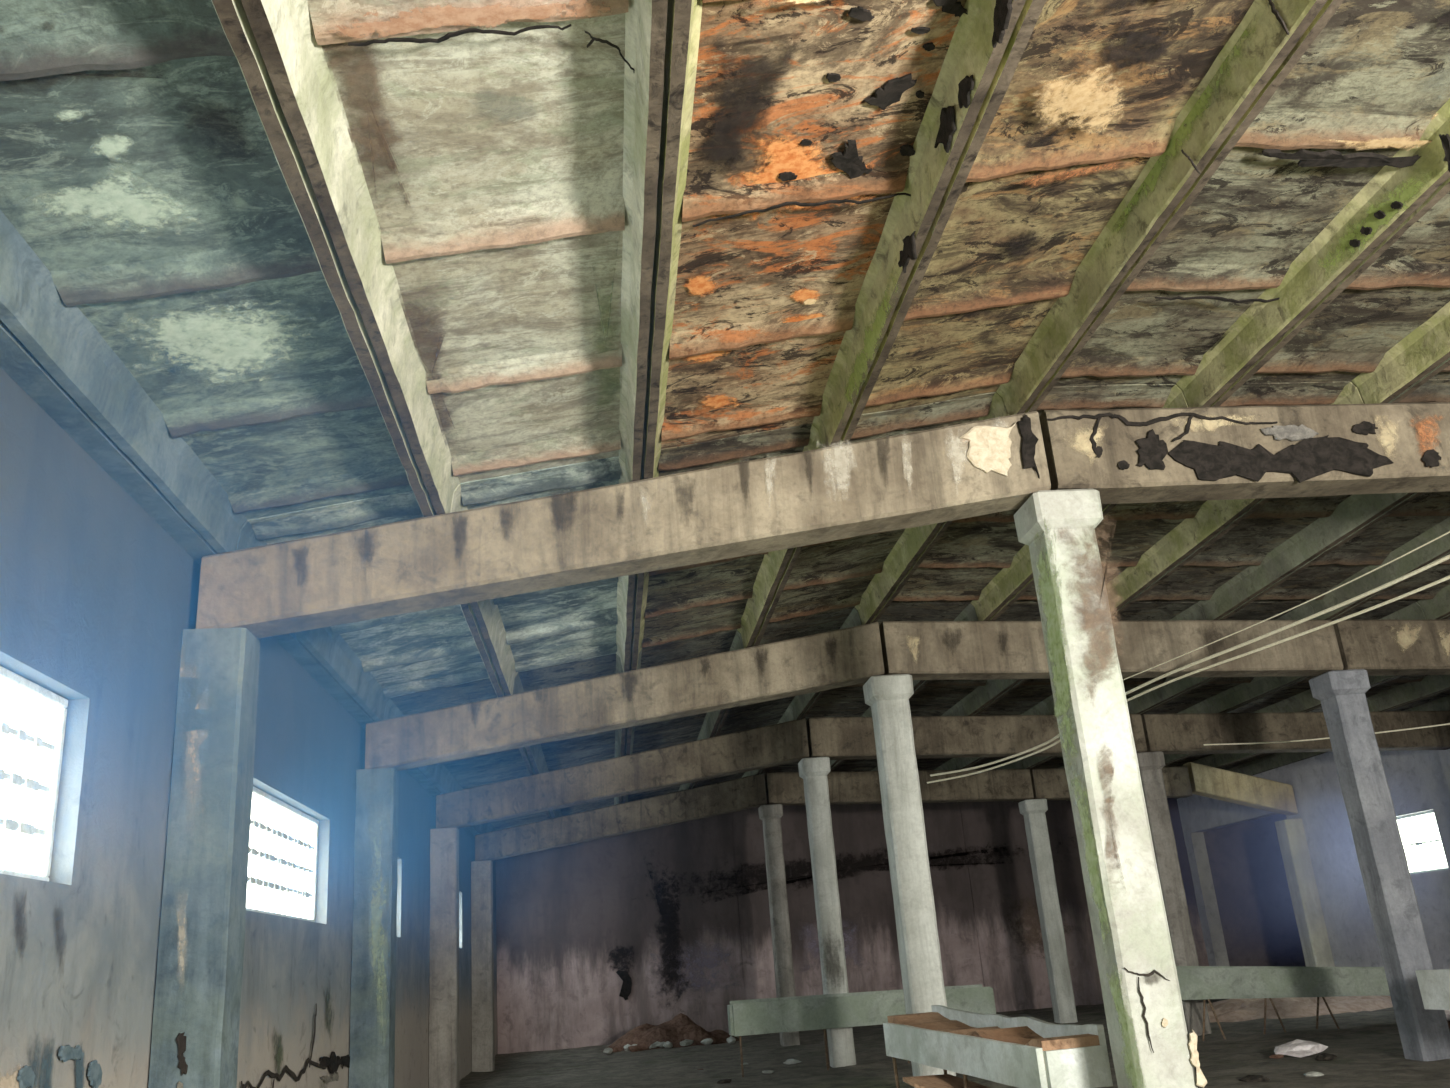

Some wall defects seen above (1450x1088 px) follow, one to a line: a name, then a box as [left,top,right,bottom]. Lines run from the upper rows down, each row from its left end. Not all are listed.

peeling [934,75,974,153]
efflorescence [36,136,188,232]
corrosion [736,135,873,185]
leakage [127,302,310,383]
corrosion [684,276,717,296]
corrosion [783,288,824,323]
spalling [960,414,1040,479]
crack [1046,412,1278,458]
peeling [1118,421,1394,483]
crack [241,1004,348,1088]
leakage [1107,967,1145,1088]
crack [1124,967,1170,1053]